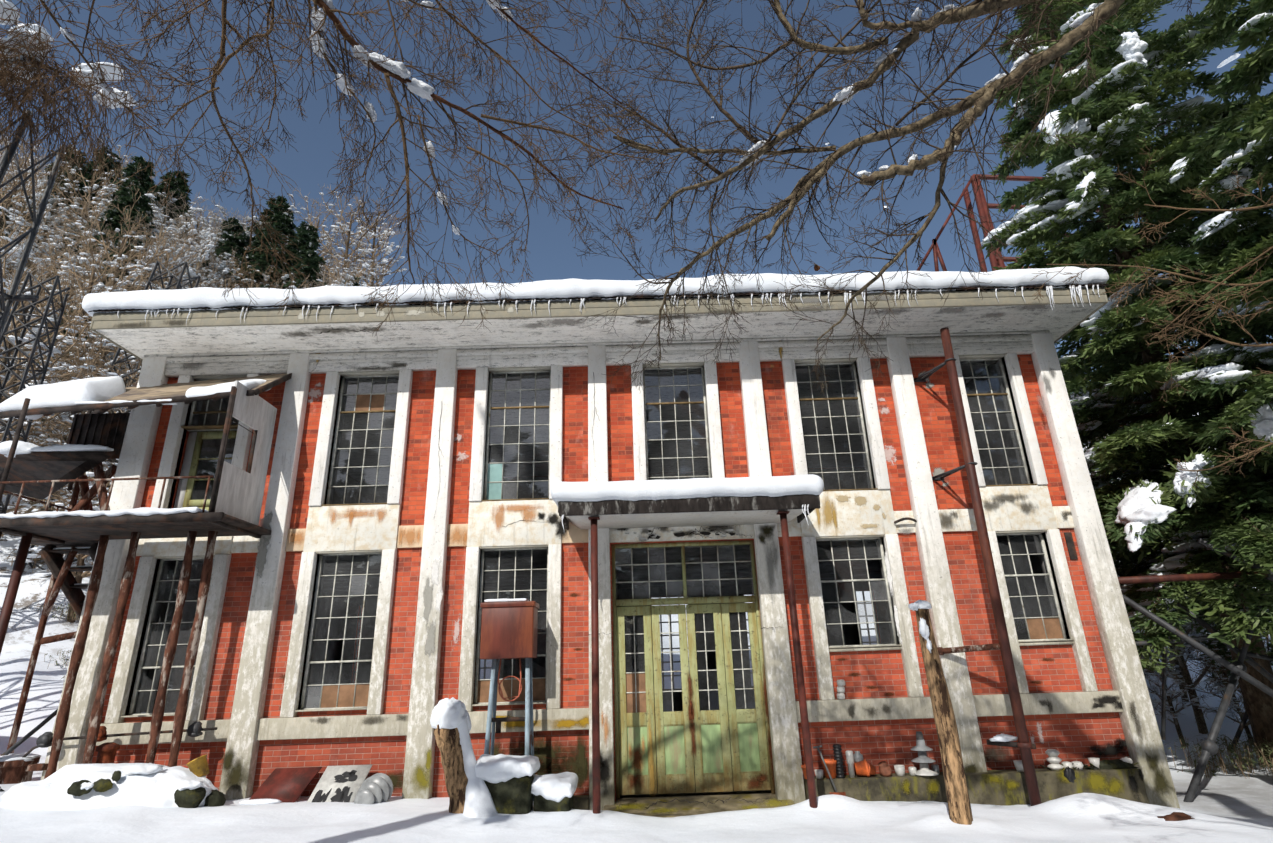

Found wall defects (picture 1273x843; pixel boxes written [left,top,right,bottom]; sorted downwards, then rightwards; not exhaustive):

rust [332,511,384,524]
rust [495,505,533,527]
water stain [984,494,1032,513]
peeling [423,558,443,656]
rust [688,676,696,755]
water stain [222,751,247,790]
rust [628,725,655,792]
rust [748,737,774,789]
water stain [964,746,1018,789]
water stain [1059,695,1171,794]